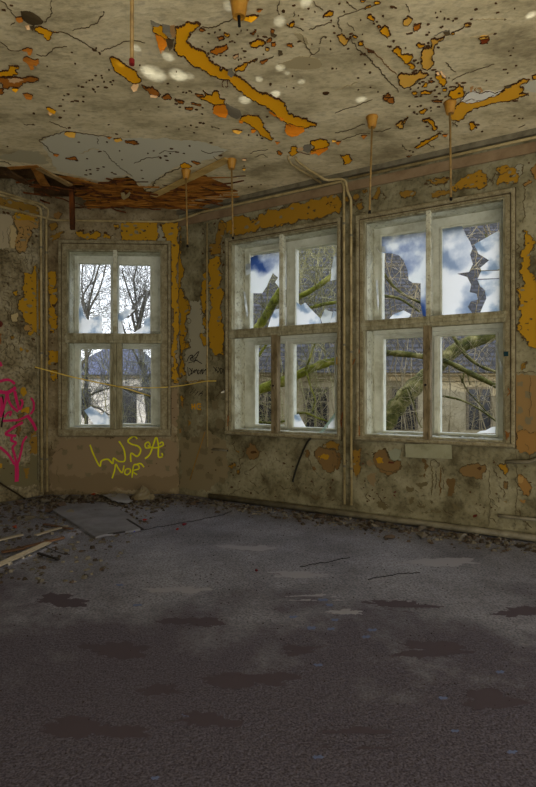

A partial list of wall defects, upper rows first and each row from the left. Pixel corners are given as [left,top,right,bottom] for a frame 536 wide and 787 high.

peeling [0,47,39,100]
crack [0,0,145,57]
peeling [109,9,353,165]
crack [277,1,425,92]
crack [335,99,391,140]
peeling [392,31,536,158]
crack [24,122,181,192]
peeling [10,265,58,336]
peeling [75,187,386,384]
peeling [516,230,536,349]
flaking render [373,448,442,514]
damp [37,592,89,608]